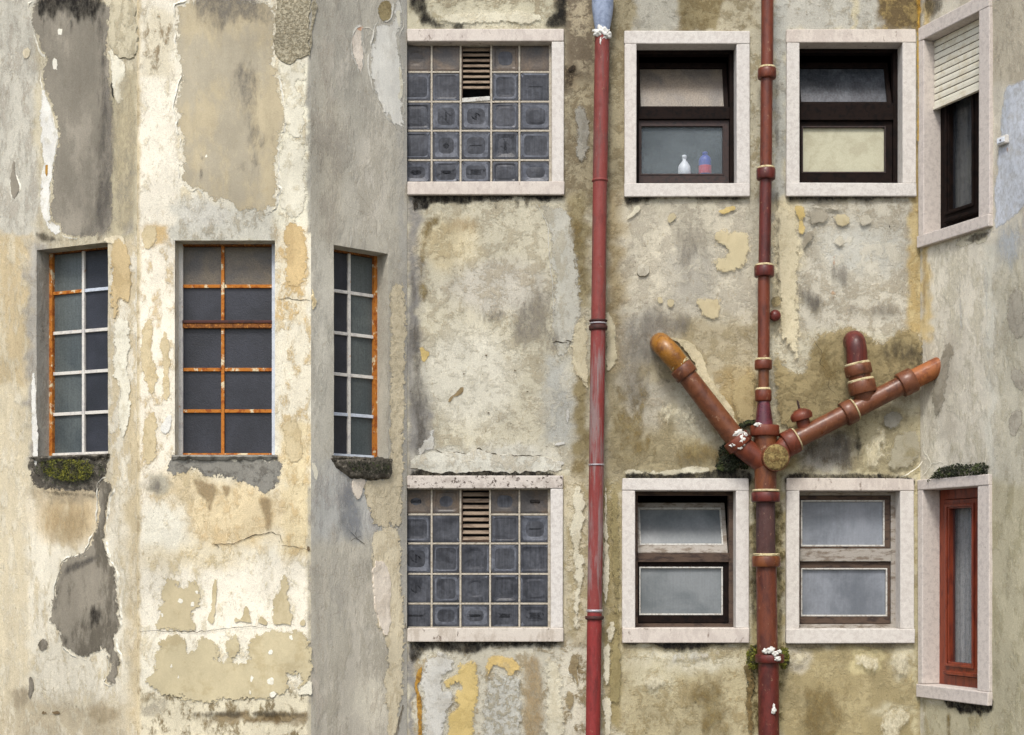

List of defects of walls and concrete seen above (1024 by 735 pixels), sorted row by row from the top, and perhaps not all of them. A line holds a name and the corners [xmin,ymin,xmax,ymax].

water stain [38,0,101,27]
water stain [410,0,463,29]
water stain [546,0,567,27]
peeling [351,0,406,131]
peeling [28,0,114,240]
peeling [172,0,287,216]
water stain [626,443,751,484]
water stain [785,430,915,484]
crack [214,532,307,550]
flaking render [38,477,123,687]
peeling [145,574,314,703]
peeling [444,655,520,735]